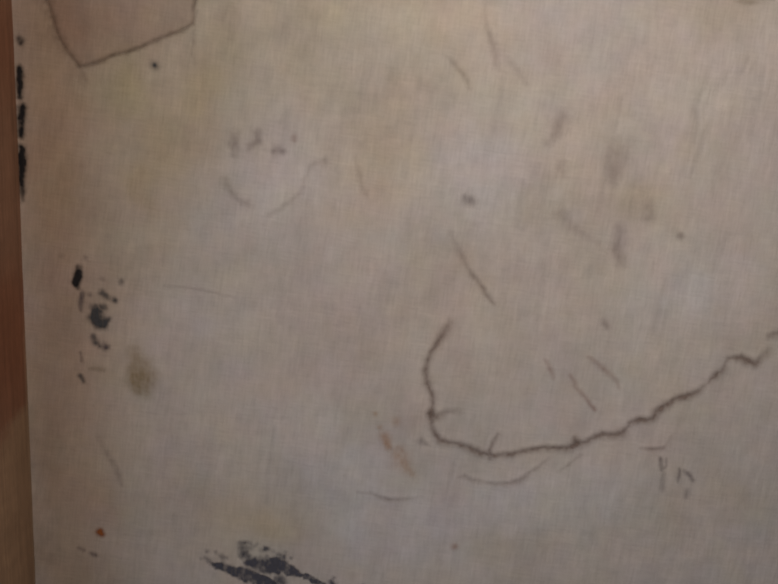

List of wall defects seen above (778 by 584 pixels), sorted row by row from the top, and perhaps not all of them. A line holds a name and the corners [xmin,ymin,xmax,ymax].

crack [425,334,695,457]
crack [735,356,757,365]